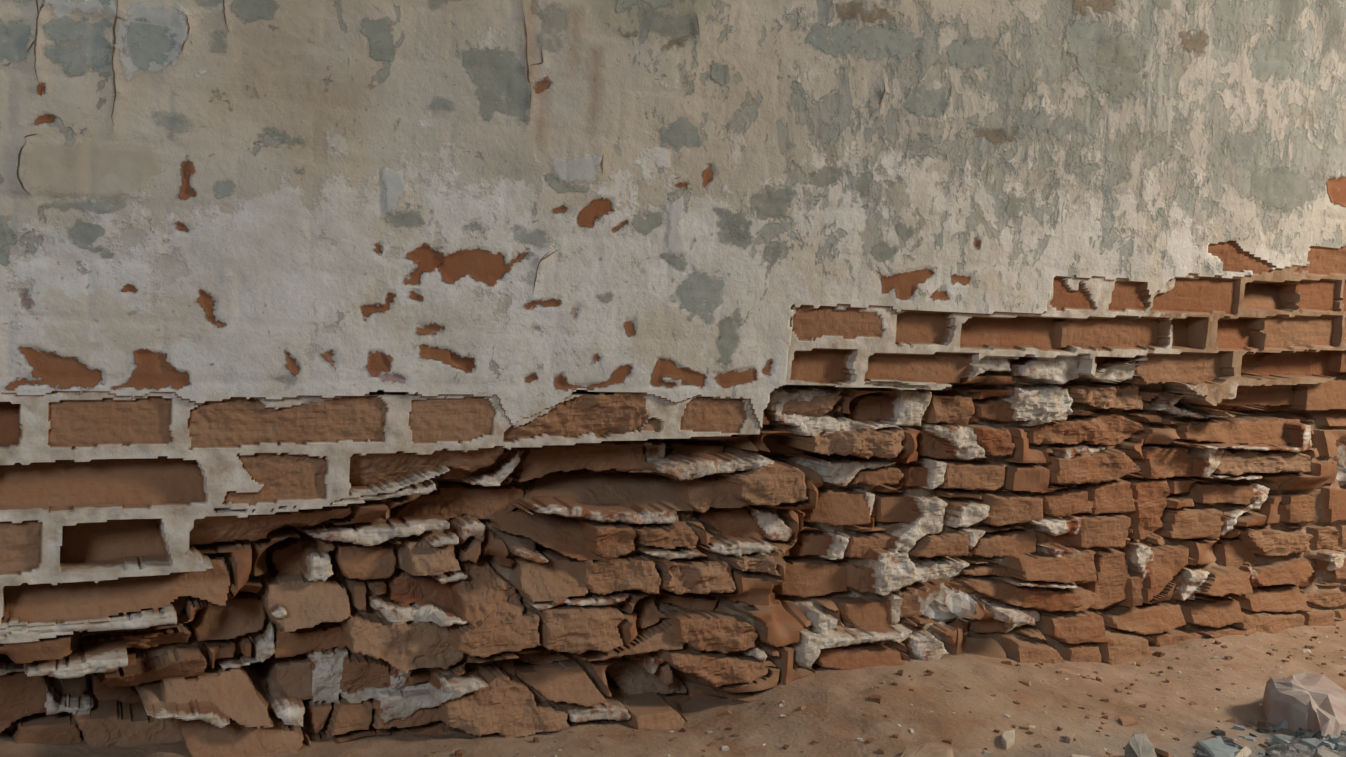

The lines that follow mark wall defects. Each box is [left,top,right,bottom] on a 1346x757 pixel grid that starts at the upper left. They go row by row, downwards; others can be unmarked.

peeling [196,0,279,24]
peeling [836,2,895,25]
peeling [43,0,187,81]
peeling [360,17,395,62]
peeling [463,48,551,125]
peeling [34,114,56,125]
peeling [978,128,1018,143]
peeling [178,160,197,200]
peeling [545,151,615,228]
peeling [810,166,841,188]
peeling [1326,175,1346,207]
spalling [0,180,1346,757]